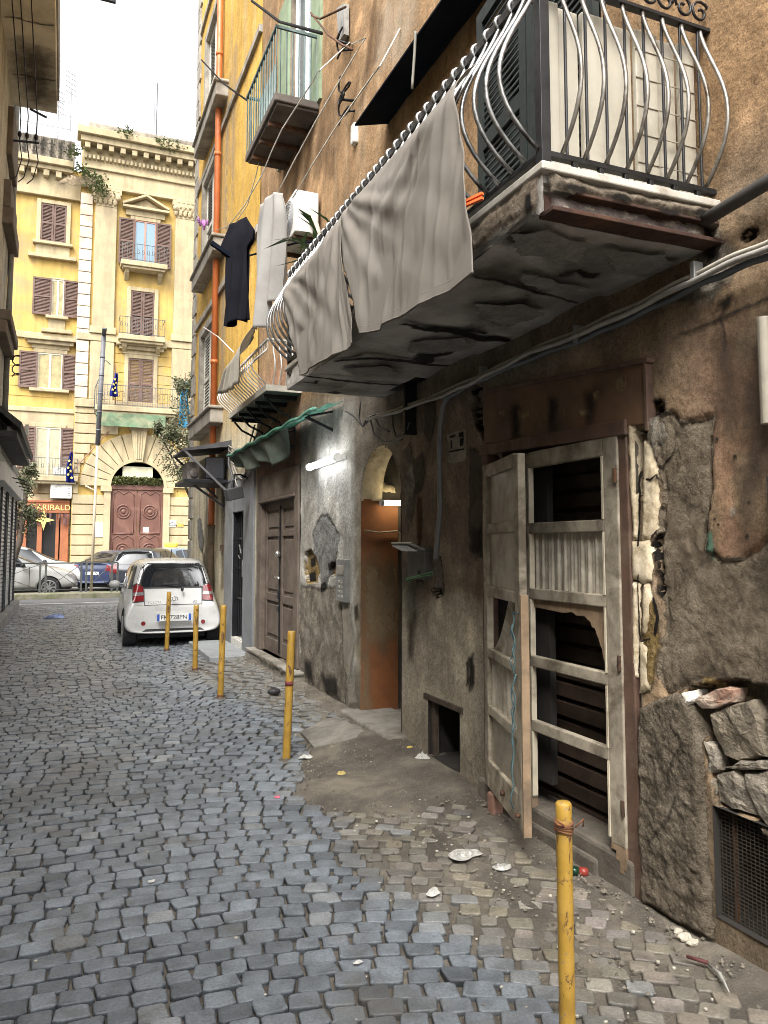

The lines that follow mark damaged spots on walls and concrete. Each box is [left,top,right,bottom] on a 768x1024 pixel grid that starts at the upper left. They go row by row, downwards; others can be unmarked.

flaking render [471,173,733,309]
spalling [741,228,759,242]
flaking render [474,304,544,326]
flaking render [299,512,361,706]
spalling [628,400,768,836]